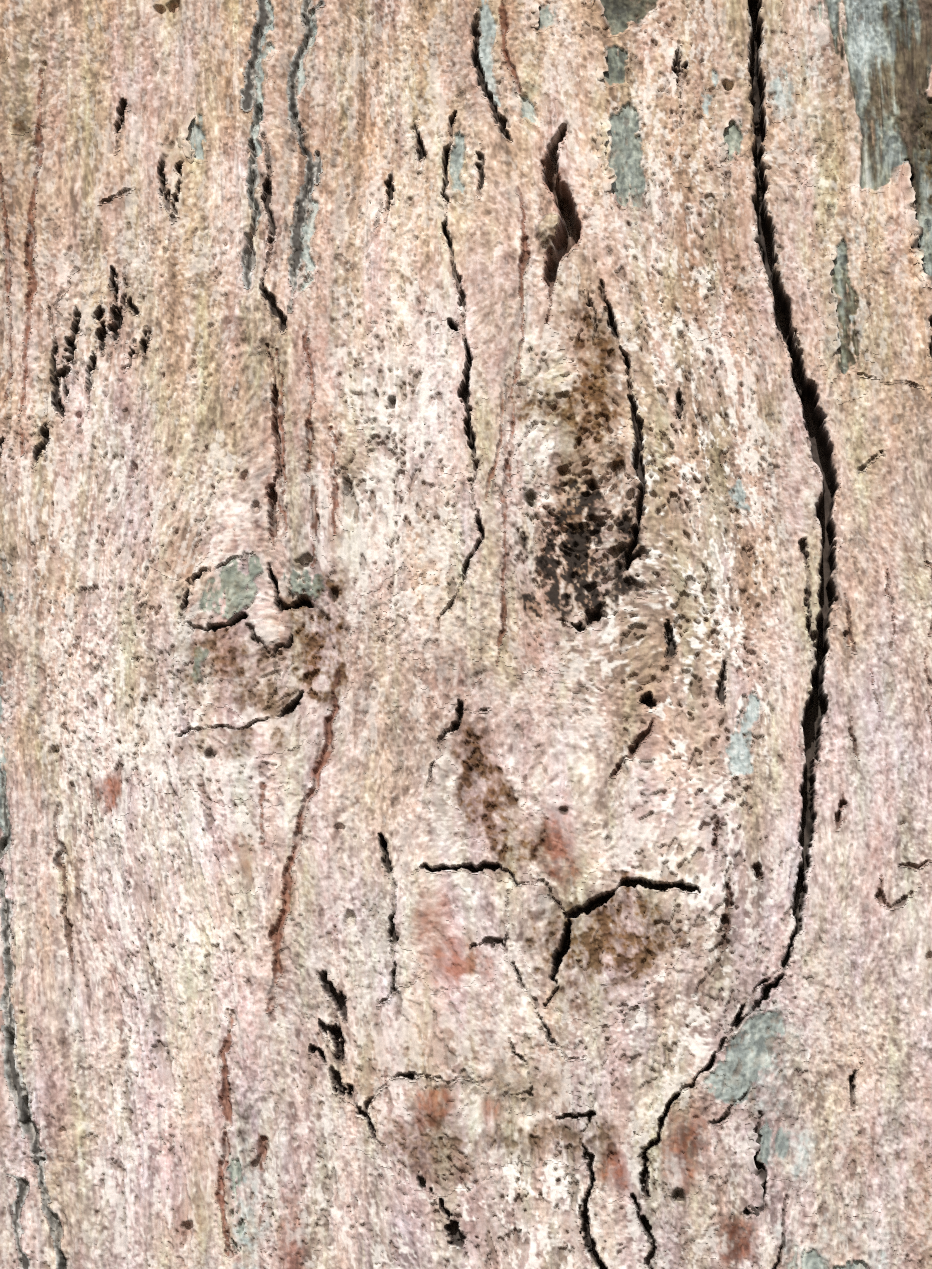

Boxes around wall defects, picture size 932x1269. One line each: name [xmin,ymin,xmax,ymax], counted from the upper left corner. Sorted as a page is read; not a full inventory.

crack [0,67,79,456]
crack [175,0,343,1258]
damp [88,287,489,807]
crack [436,0,531,665]
damp [499,276,662,646]
crack [584,278,647,575]
crack [630,0,896,1269]
peeling [821,246,864,376]
peeling [814,0,932,287]
crack [0,760,68,1269]
crack [375,831,701,1269]
spalling [874,875,922,910]